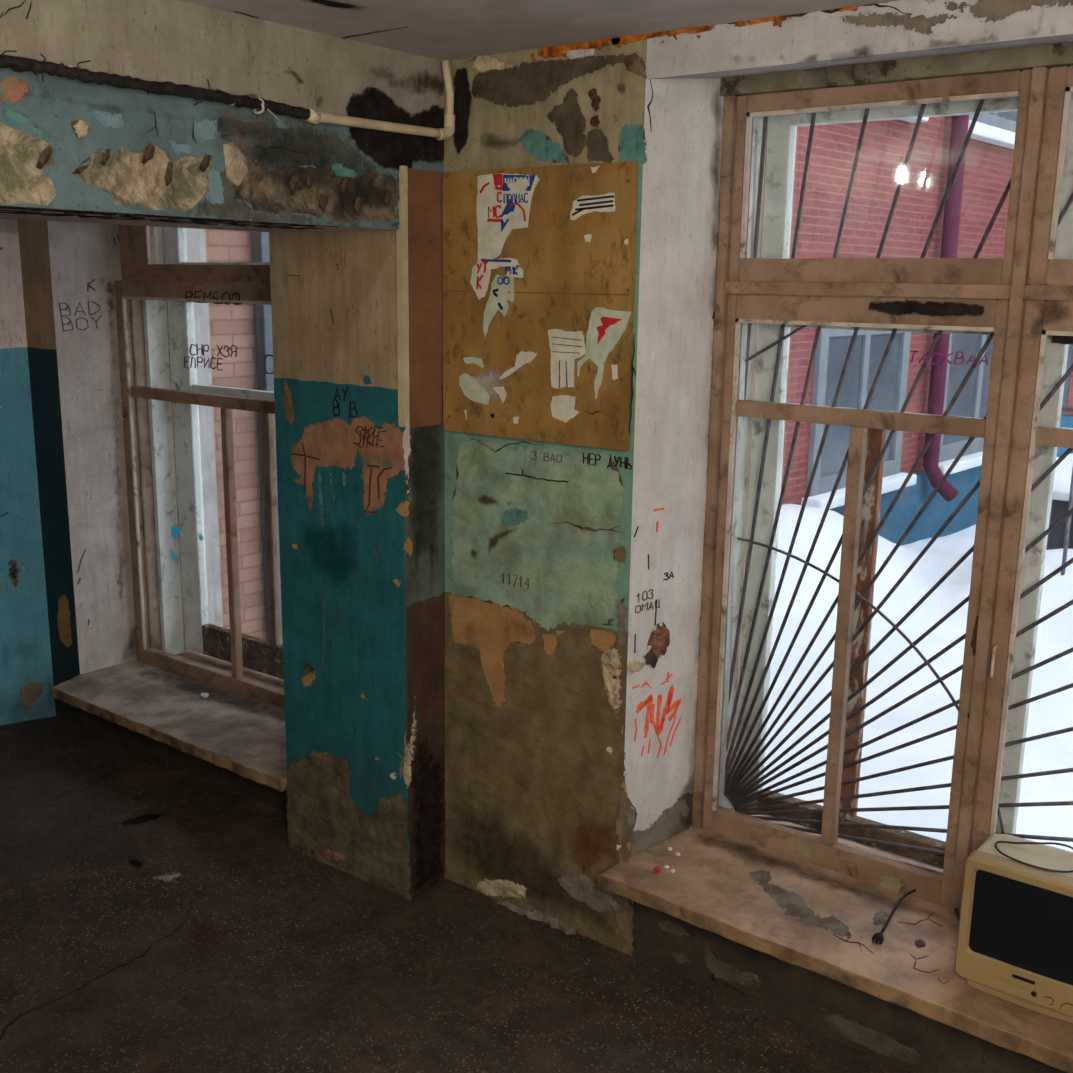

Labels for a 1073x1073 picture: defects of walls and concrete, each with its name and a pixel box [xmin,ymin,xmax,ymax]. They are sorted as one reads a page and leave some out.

flaking render [0,74,63,206]
flaking render [70,110,400,229]
leakage [412,74,444,93]
corrosion [735,13,801,27]
peeling [839,0,1073,36]
peeling [282,379,412,525]
peeling [57,594,72,649]
peeling [445,437,693,956]
peeling [286,696,417,900]
leakage [412,742,445,891]
crack [0,890,198,1040]